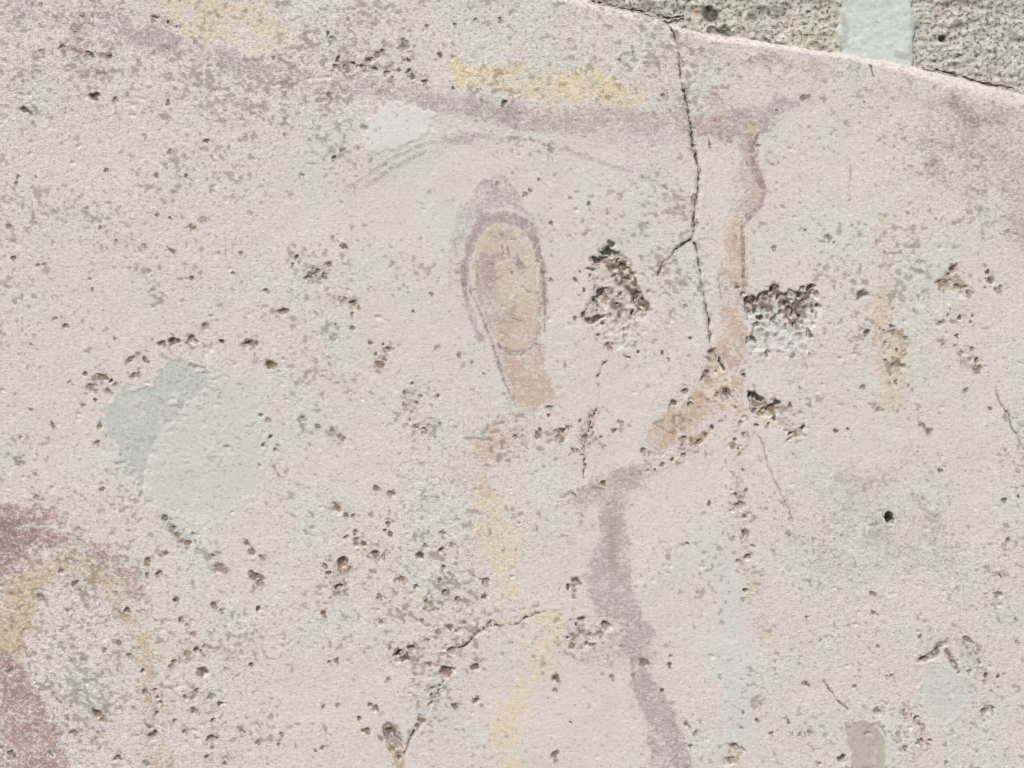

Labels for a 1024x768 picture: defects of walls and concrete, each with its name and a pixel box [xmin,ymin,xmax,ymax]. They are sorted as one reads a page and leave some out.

crack [588,0,725,370]
spalling [572,240,653,359]
spalling [735,282,824,365]